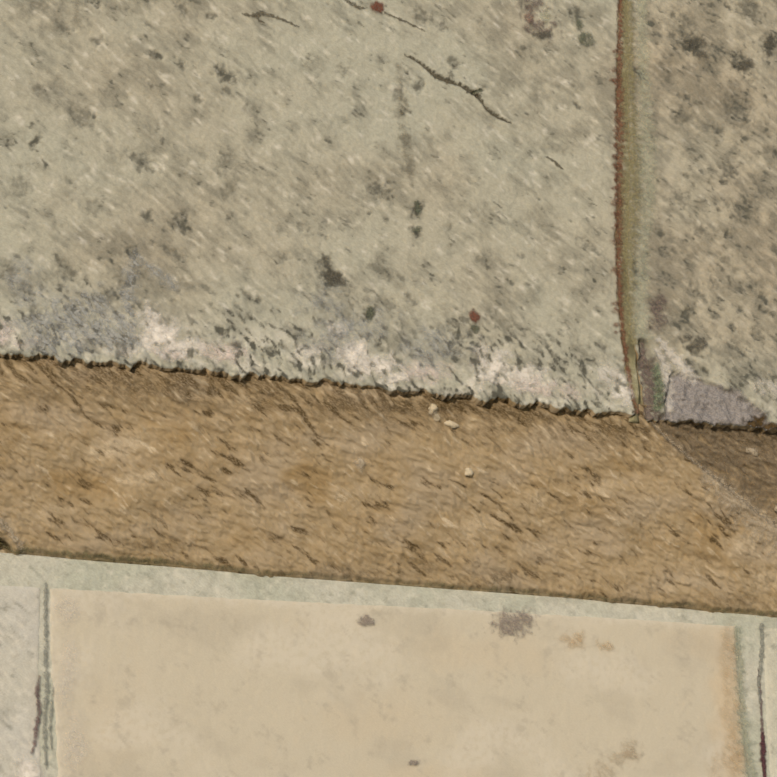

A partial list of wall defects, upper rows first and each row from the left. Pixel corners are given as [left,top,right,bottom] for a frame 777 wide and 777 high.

crack [406,55,510,123]
corrosion [612,0,639,413]